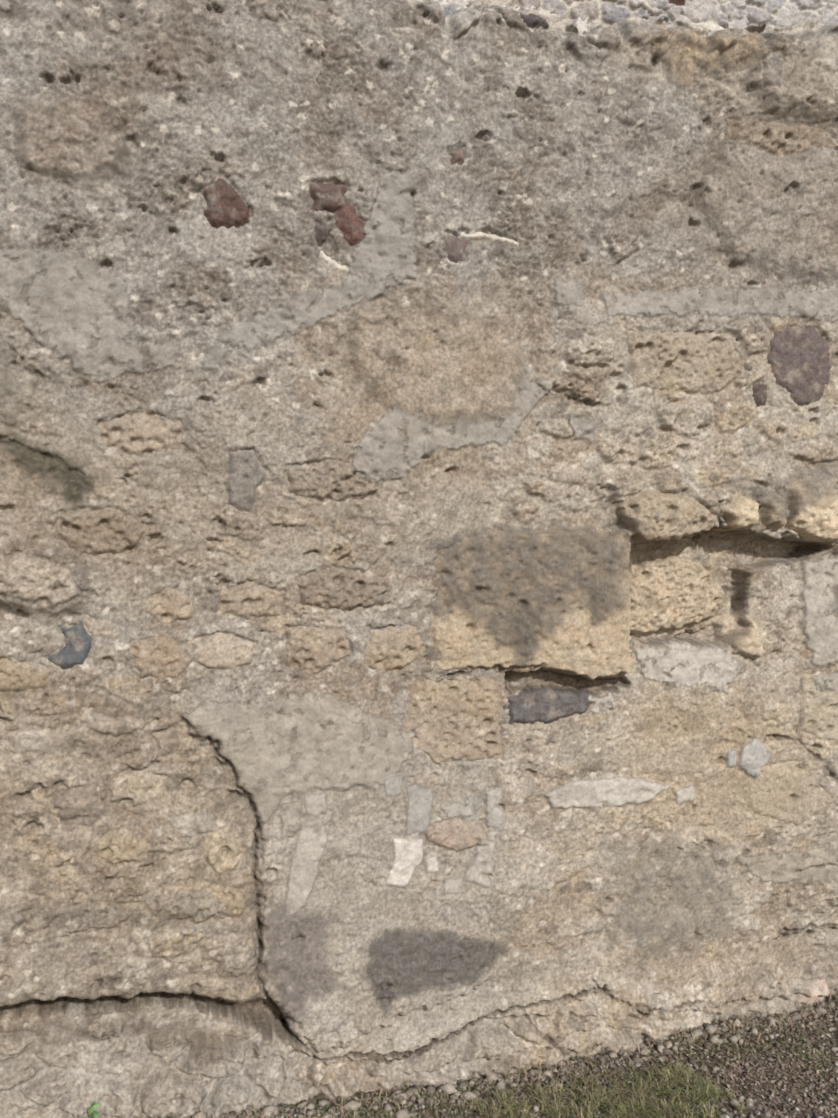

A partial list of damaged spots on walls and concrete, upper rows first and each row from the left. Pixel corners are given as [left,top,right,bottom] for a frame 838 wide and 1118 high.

crack [207,736,269,997]
damp [368,930,503,1011]
crack [297,984,613,1099]